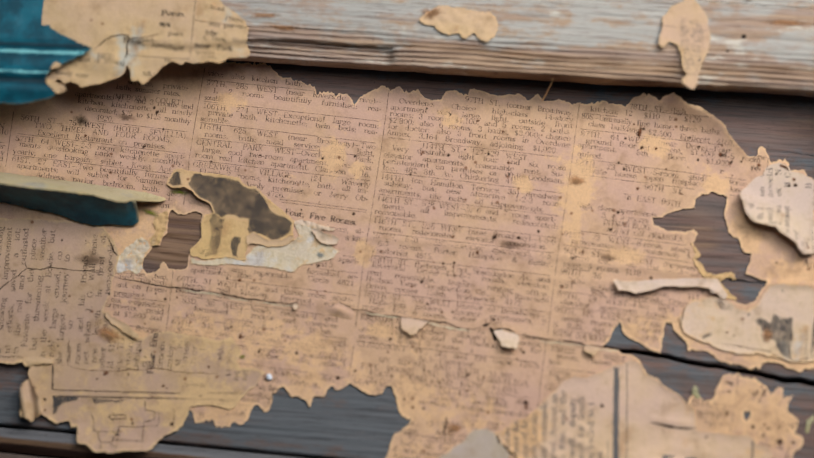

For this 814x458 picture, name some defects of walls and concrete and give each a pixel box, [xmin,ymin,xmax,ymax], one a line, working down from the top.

peeling [149,211,168,246]
peeling [691,243,737,300]
crack [0,263,814,386]